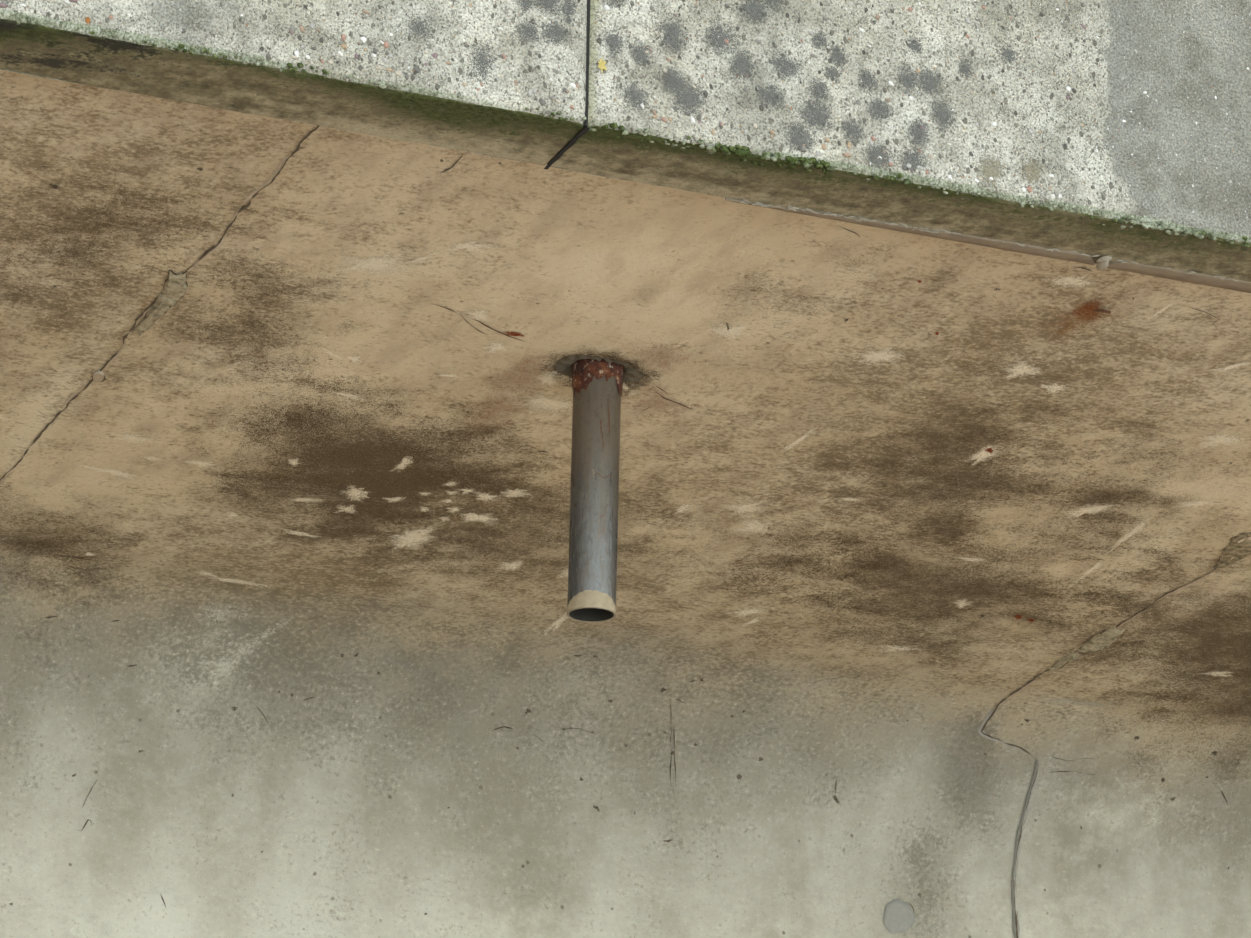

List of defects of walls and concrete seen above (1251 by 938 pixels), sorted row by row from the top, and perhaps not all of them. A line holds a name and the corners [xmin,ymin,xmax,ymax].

crack [184,125,319,274]
crack [0,295,159,484]
rust [572,359,623,398]
leakage [0,134,1251,828]
crack [1110,560,1227,630]
crack [978,646,1093,938]